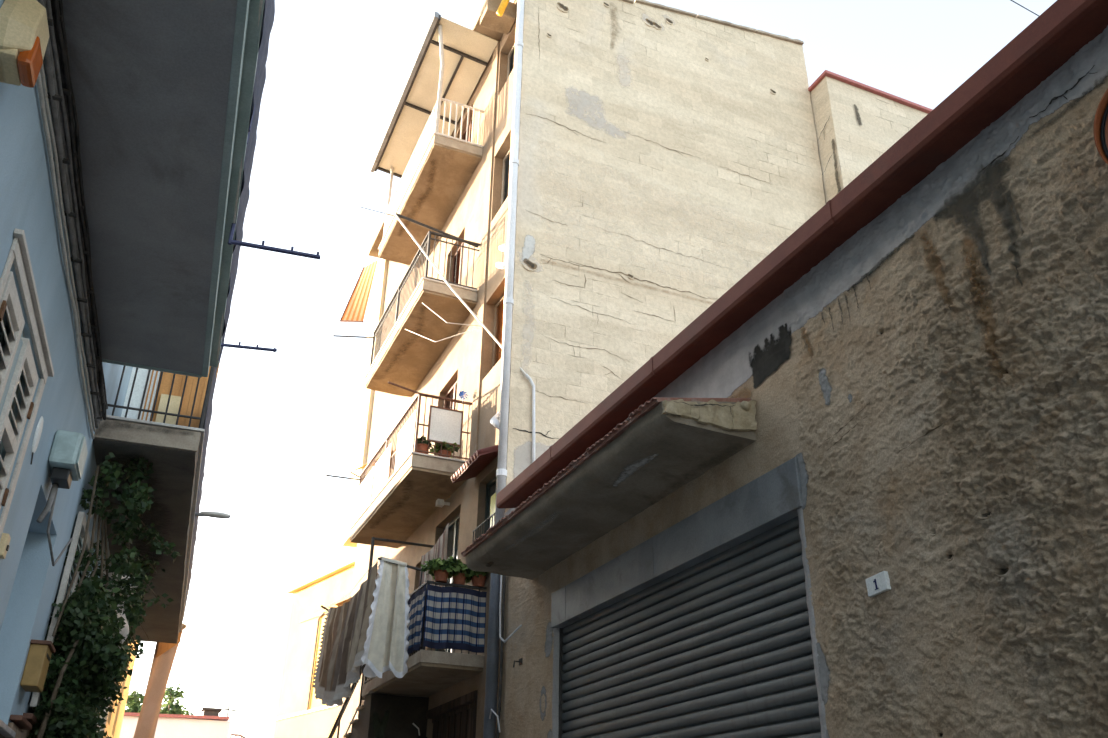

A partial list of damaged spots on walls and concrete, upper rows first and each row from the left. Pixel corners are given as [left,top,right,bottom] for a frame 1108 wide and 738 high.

crack [981,66,1097,171]
damp [934,158,1024,286]
crack [541,254,711,324]
rust [920,233,953,308]
rust [963,238,1008,377]
crack [540,333,623,380]
damp [749,323,792,388]